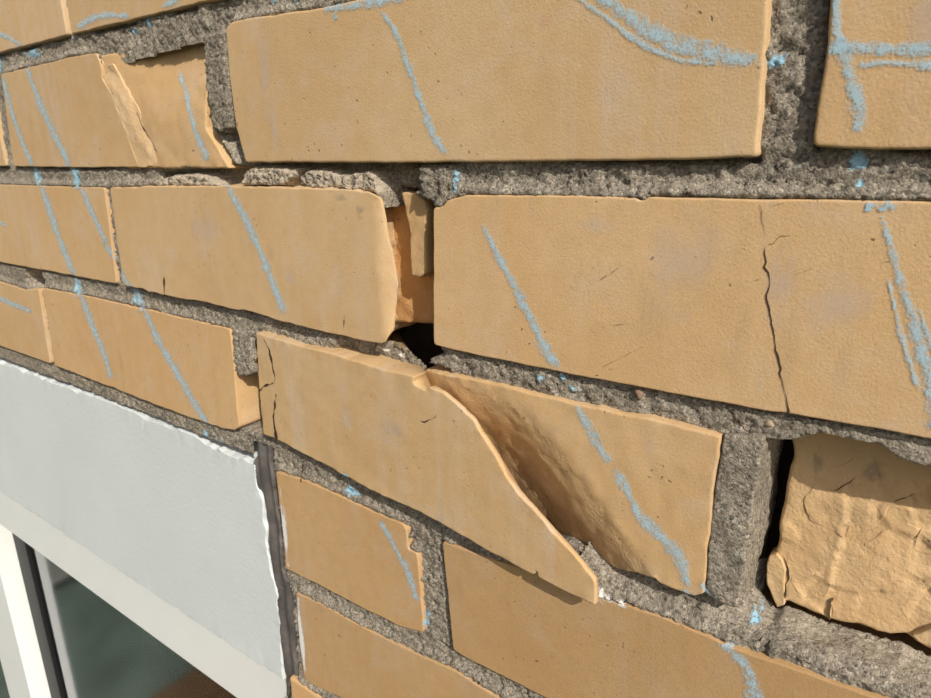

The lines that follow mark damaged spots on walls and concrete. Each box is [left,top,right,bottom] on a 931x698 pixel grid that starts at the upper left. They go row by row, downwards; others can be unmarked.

spalling [100,42,247,169]
crack [259,340,278,439]
crack [761,211,790,413]
spalling [767,432,931,648]